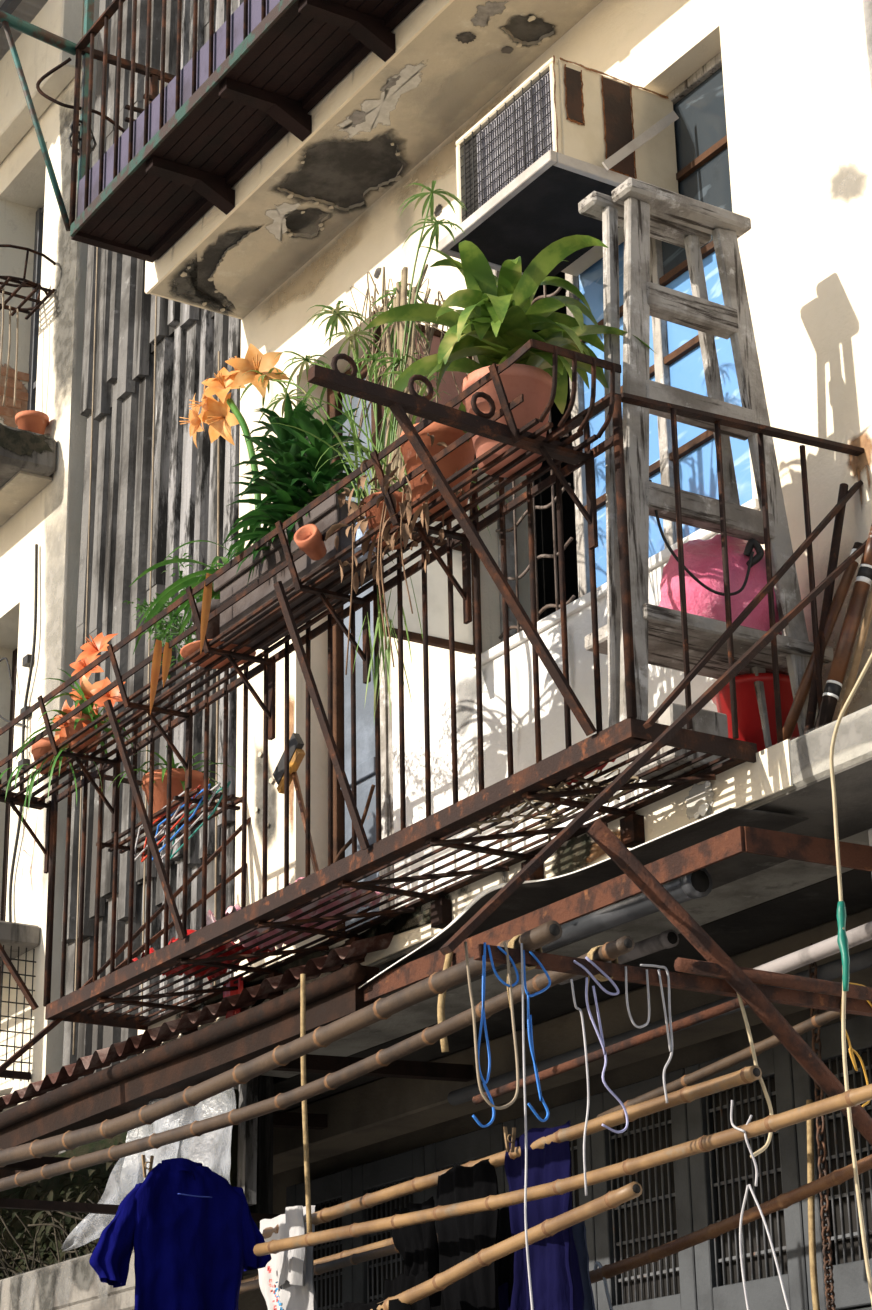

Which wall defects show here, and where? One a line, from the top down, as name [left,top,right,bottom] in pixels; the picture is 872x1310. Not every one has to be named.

spalling [456,1,556,54]
spalling [171,63,426,314]
water stain [832,167,864,199]
rust [848,433,872,507]